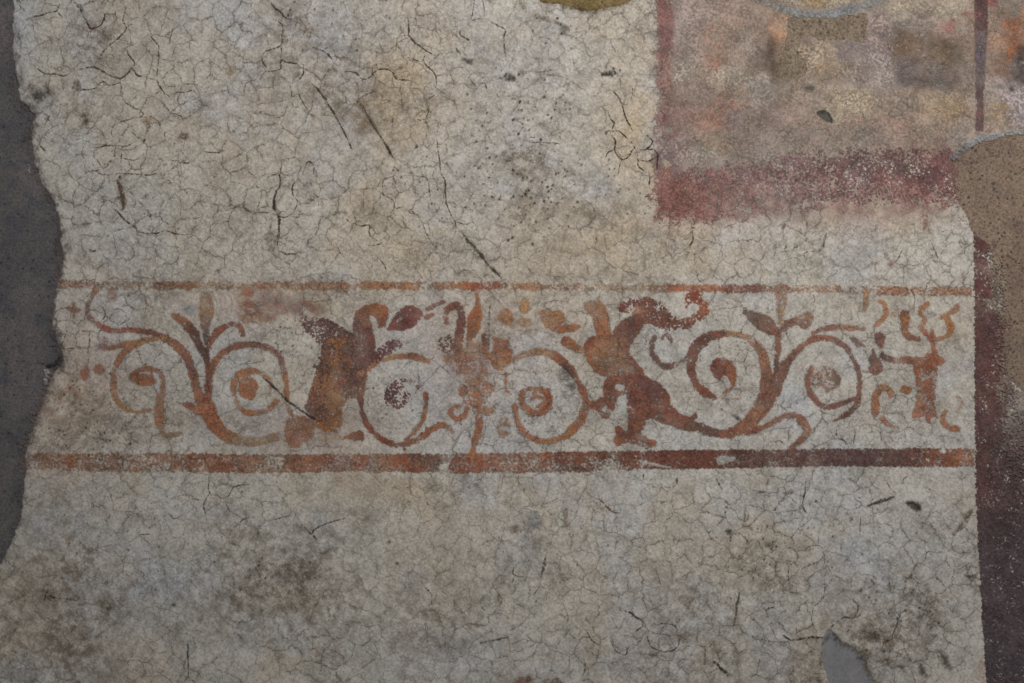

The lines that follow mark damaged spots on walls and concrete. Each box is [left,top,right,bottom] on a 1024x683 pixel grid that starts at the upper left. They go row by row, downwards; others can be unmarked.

crack [30,2,222,175]
crack [244,3,506,256]
crack [606,88,659,185]
crack [115,209,183,235]
crack [226,161,386,269]
crack [164,484,249,522]
crack [584,607,680,673]
crack [767,587,861,640]